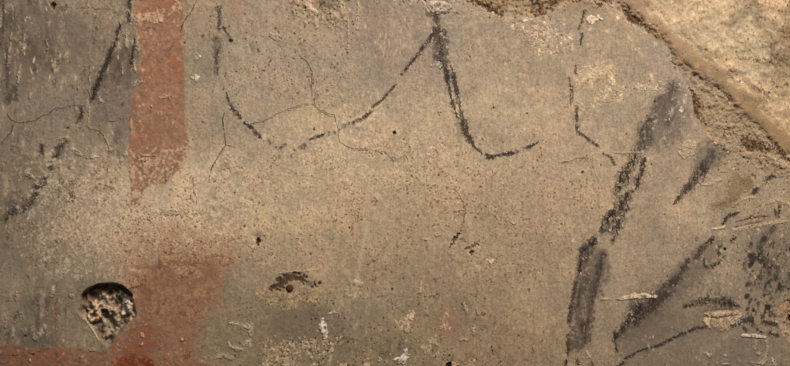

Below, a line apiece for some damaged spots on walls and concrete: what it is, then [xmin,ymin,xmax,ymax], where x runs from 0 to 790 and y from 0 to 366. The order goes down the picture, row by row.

crack [0,63,132,177]
crack [192,111,237,205]
crack [247,54,409,162]
spalling [77,281,142,352]